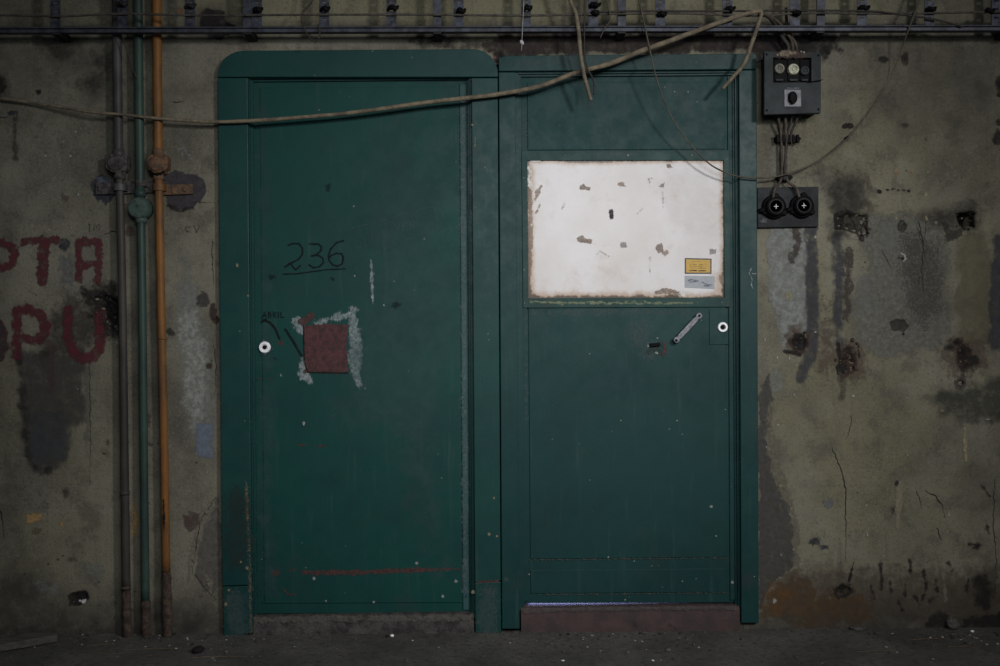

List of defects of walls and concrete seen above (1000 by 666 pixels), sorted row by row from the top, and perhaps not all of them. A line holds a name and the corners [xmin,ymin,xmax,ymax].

spalling [834,209,871,242]
spalling [943,211,978,241]
water stain [796,227,819,383]
water stain [832,232,854,344]
crack [832,417,854,585]